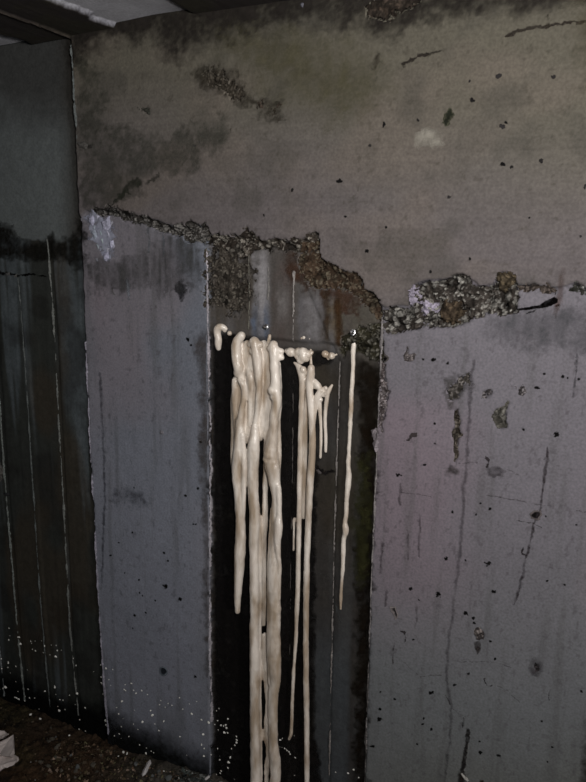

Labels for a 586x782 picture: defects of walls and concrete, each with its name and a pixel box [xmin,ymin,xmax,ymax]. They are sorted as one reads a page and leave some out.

crack [505,20,586,37]
crack [401,51,440,68]
water stain [0,209,130,297]
peeling [408,285,440,316]
spalling [491,401,509,429]
spalling [448,409,463,474]